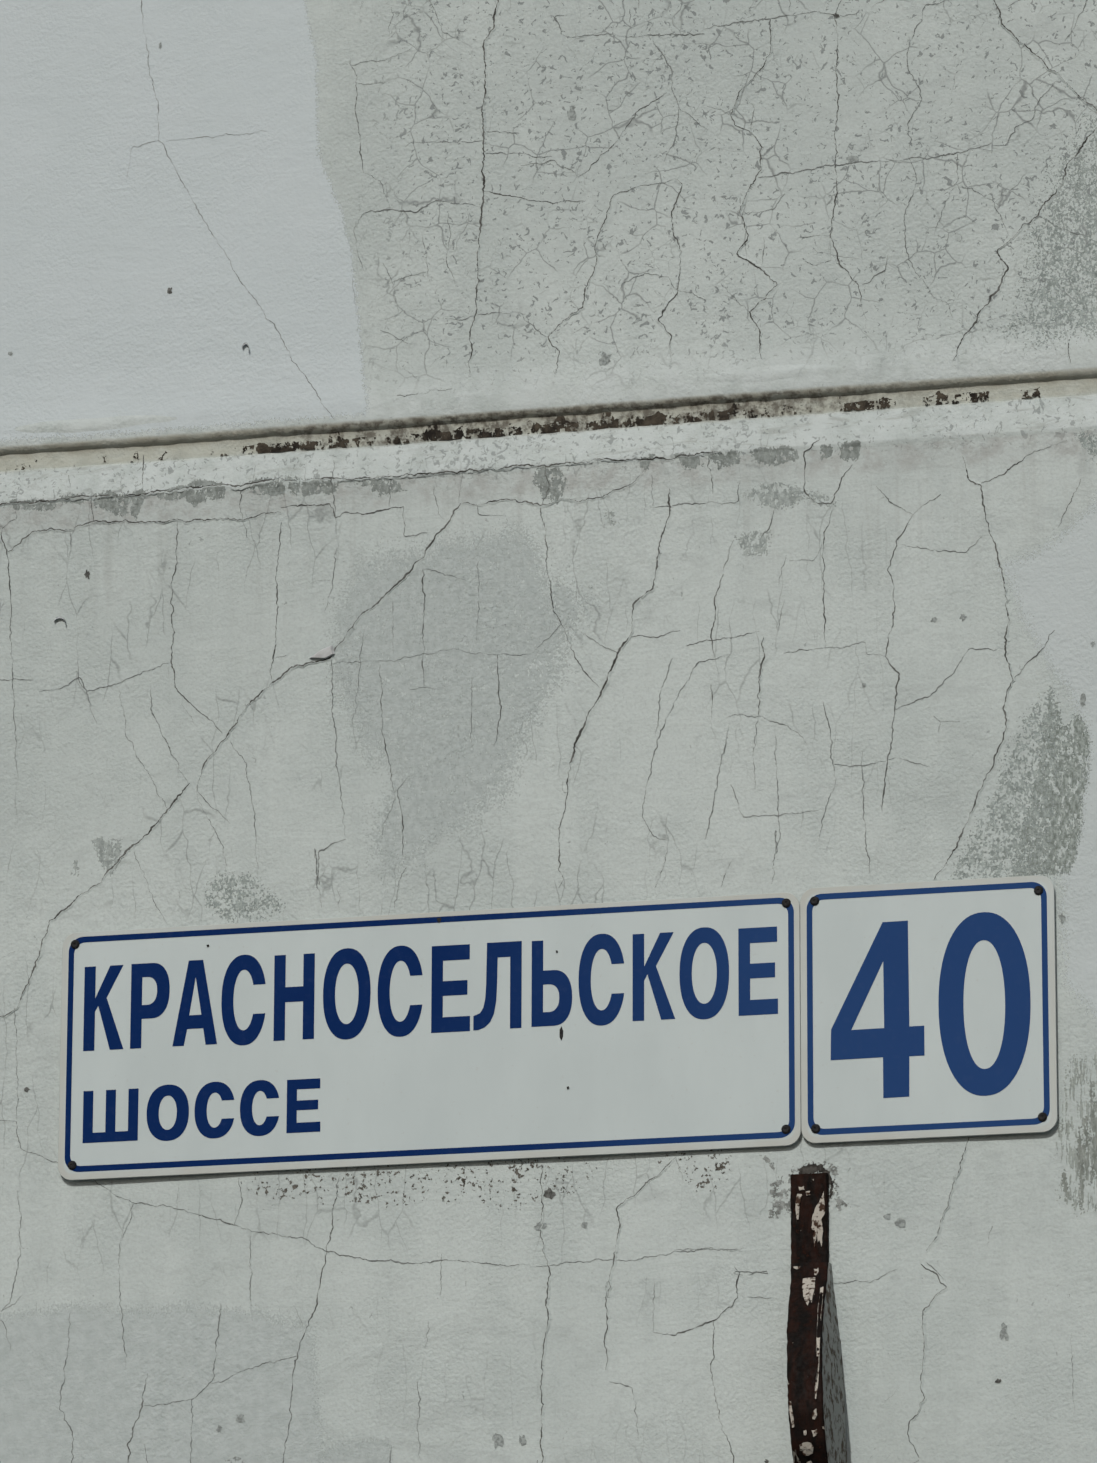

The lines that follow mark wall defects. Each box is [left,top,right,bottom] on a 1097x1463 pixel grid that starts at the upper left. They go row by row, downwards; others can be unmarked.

crack [127,0,334,419]
crack [350,0,1097,397]
crack [0,440,1061,1163]
peeling [948,685,1093,880]
crack [0,1190,22,1348]
crack [59,1315,74,1463]
crack [93,1158,769,1463]
crack [835,1137,972,1462]